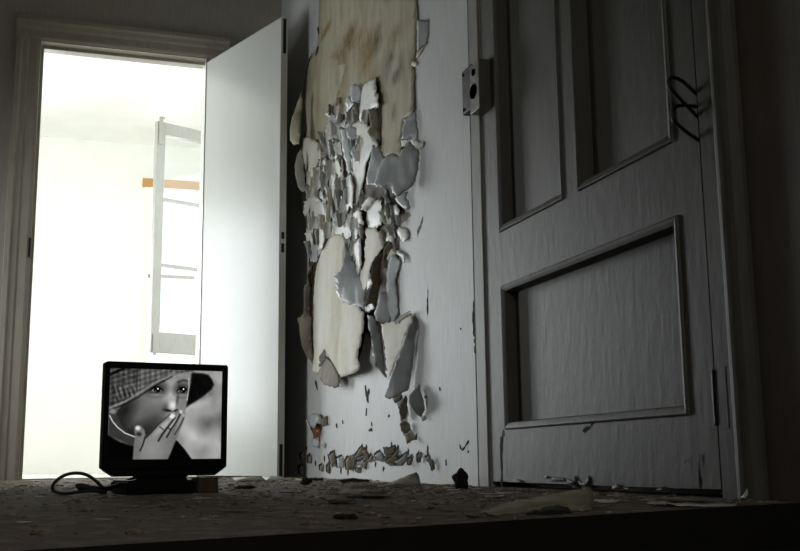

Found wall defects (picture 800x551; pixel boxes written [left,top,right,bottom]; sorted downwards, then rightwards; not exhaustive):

peeling [290,0,435,475]